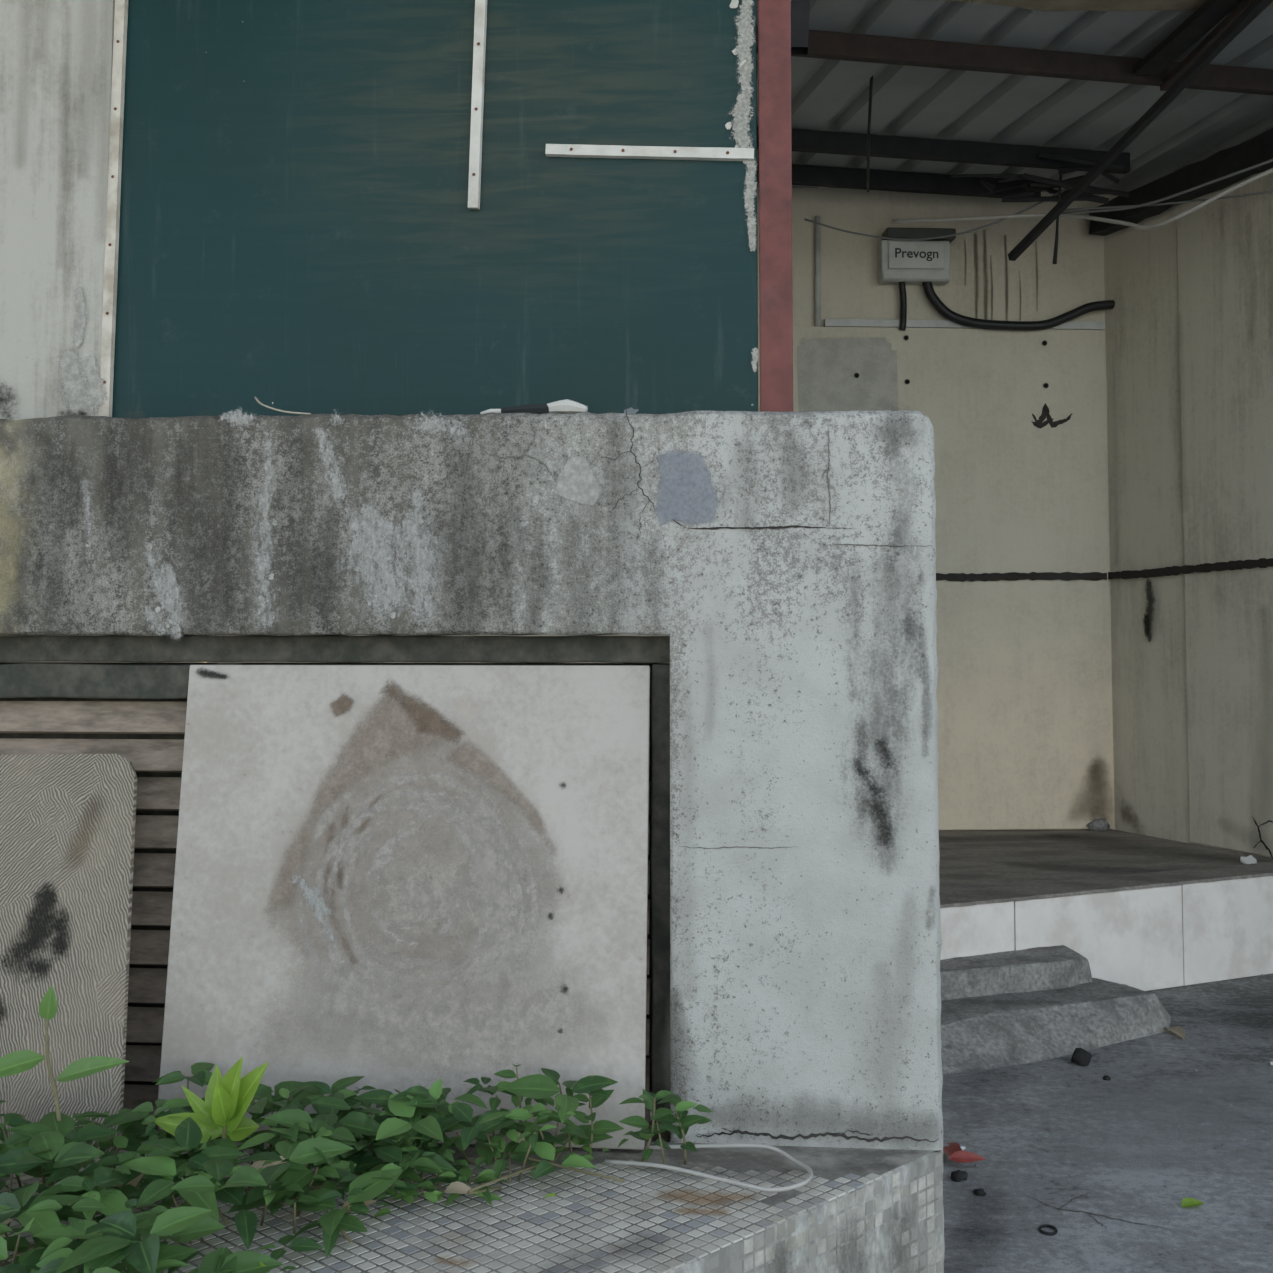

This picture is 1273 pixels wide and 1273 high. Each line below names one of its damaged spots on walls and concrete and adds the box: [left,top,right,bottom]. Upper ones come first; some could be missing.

peeling [725,0,757,251]
peeling [751,348,759,372]
crack [602,408,933,551]
crack [1252,817,1273,859]
crack [696,1128,938,1142]